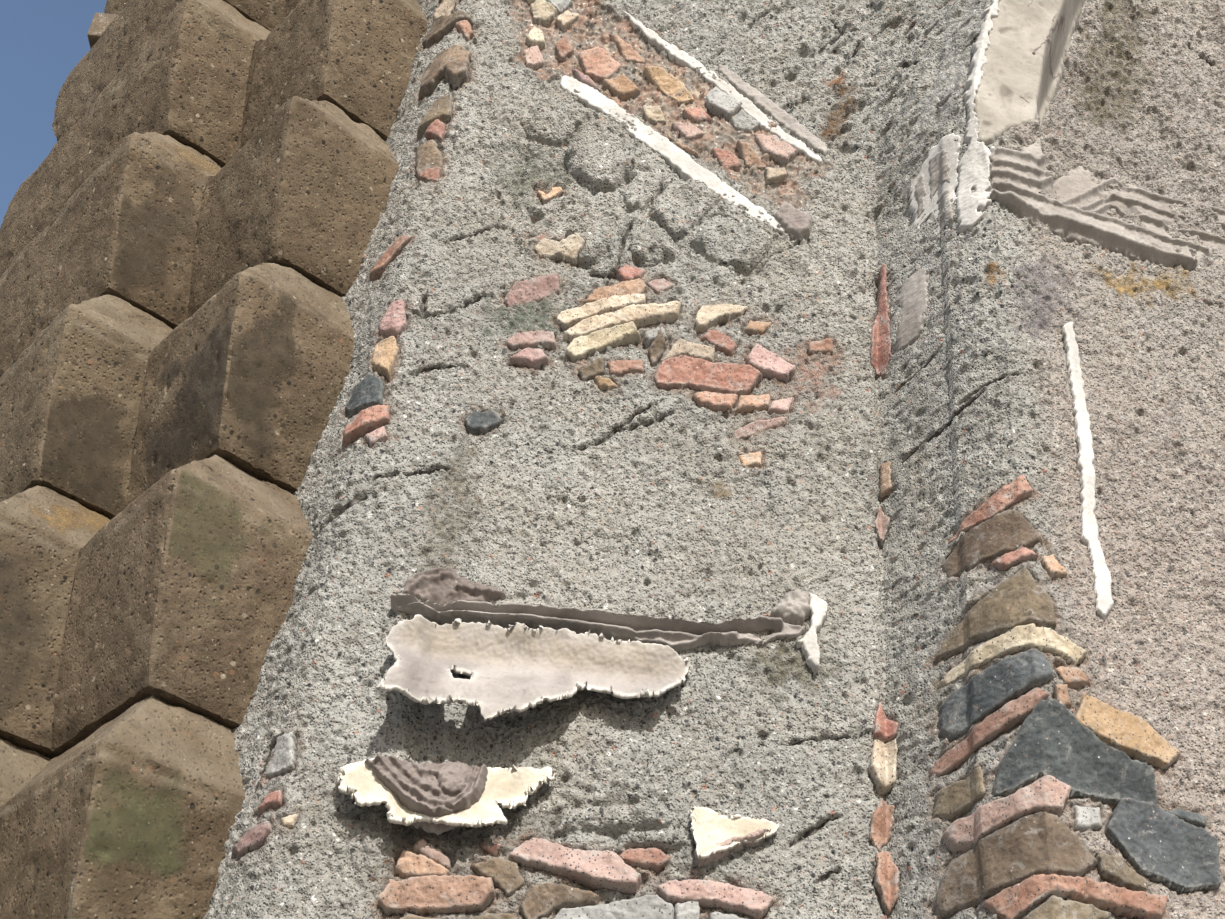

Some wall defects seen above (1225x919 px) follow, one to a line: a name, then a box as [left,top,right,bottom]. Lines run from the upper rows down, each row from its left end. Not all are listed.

crack [581,404,671,451]
crack [903,374,1009,463]
crack [317,469,448,536]
crack [781,733,868,746]
spalling [378,806,779,919]